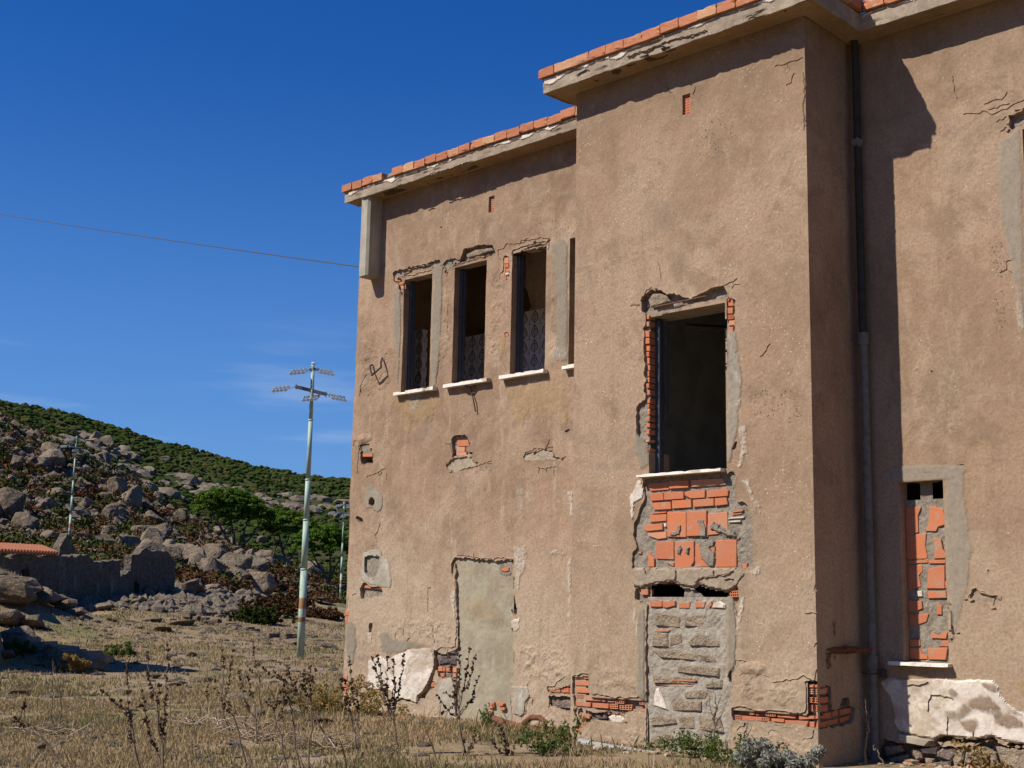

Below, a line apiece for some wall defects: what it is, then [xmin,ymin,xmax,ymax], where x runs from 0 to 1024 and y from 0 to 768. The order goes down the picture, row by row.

peeling [544,35,676,85]
crack [952,76,1024,132]
flaking render [395,199,567,375]
flaking render [638,287,737,453]
flaking render [447,435,492,473]
flaking render [633,472,753,571]
flaking render [363,542,383,598]
crack [968,587,997,605]
flaking render [389,616,458,690]
flaking render [512,642,648,746]
flaking render [730,666,851,757]
flaking render [931,682,1022,746]